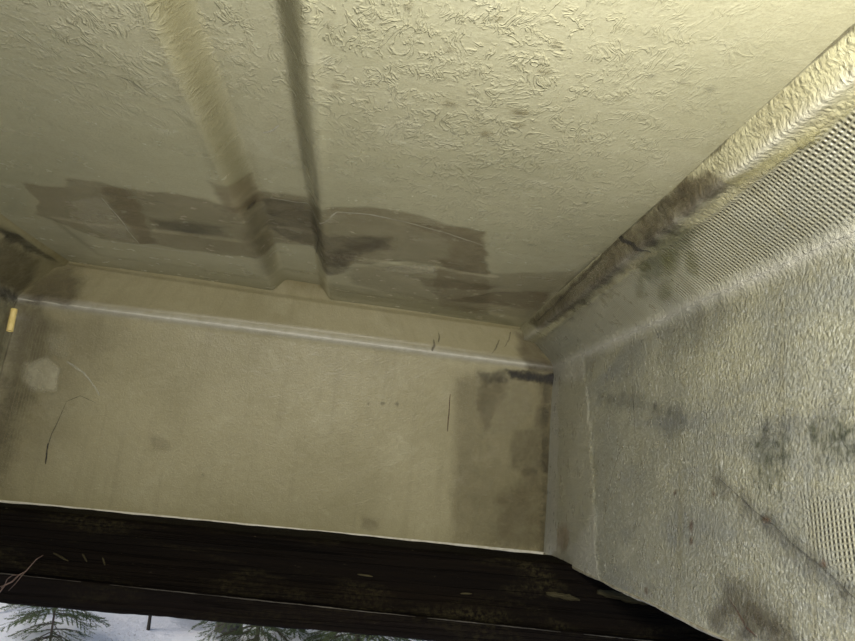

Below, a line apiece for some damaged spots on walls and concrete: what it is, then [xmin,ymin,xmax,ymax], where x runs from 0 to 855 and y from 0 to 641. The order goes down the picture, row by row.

leakage [531,174,726,326]
leakage [508,360,554,384]
crack [760,515,852,596]
leakage [721,597,783,637]